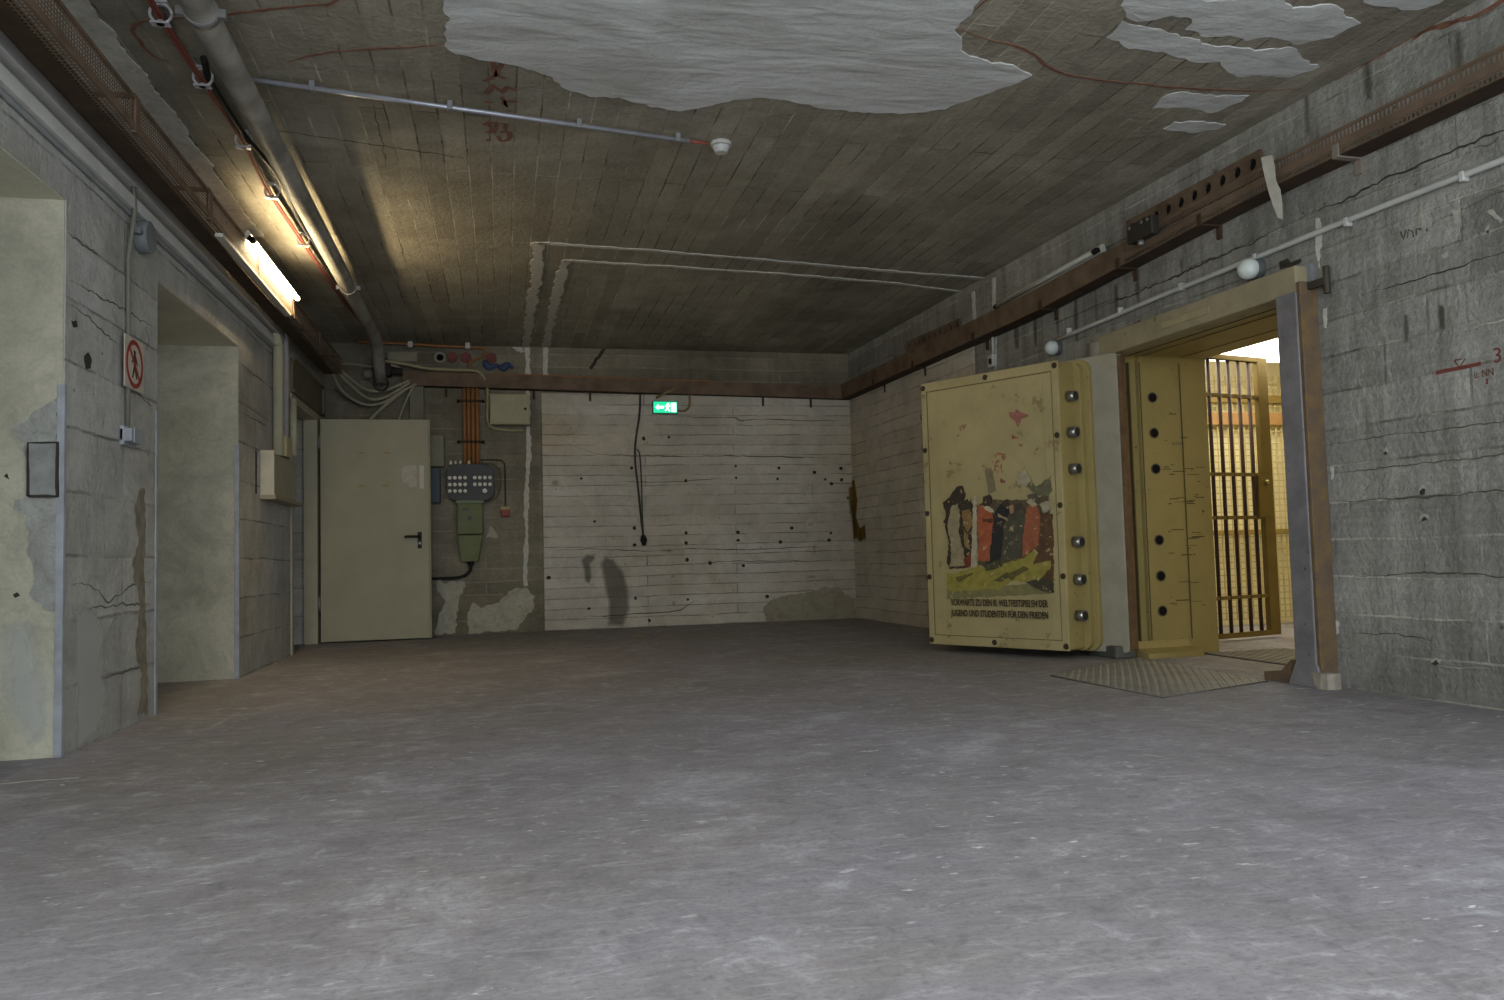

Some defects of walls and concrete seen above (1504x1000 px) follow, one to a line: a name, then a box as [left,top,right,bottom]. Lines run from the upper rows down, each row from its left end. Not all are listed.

flaking render [443,0,1032,114]
rust [1334,0,1504,81]
crack [71,582,149,615]